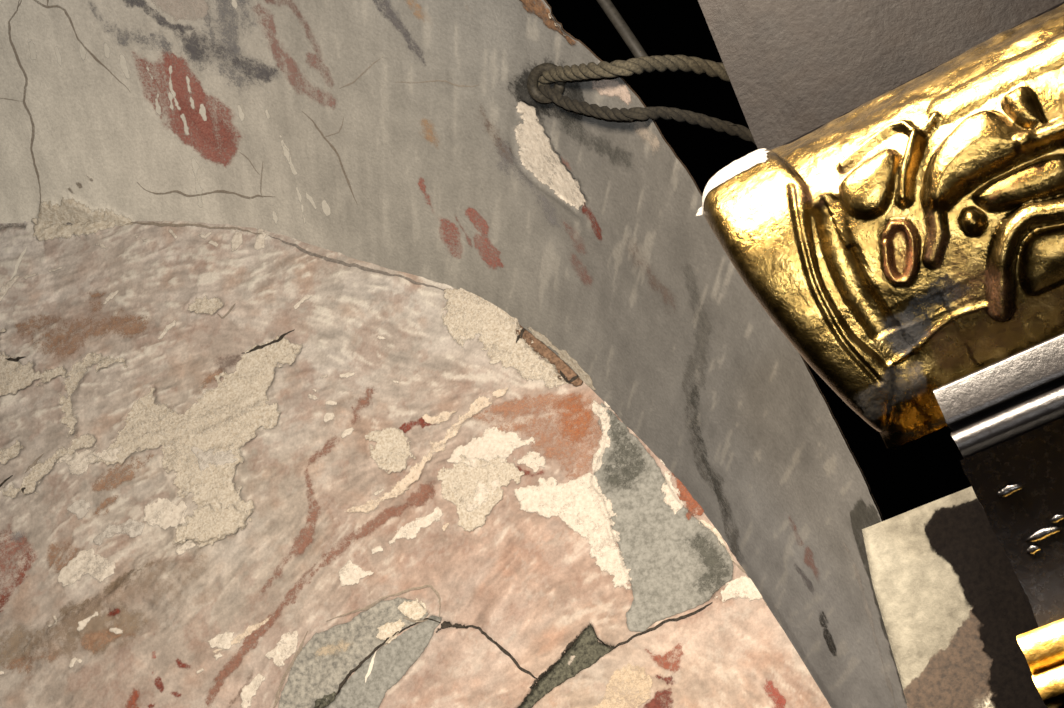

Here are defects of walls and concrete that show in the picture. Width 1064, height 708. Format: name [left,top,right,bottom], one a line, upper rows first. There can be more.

crack [0,0,129,229]
spalling [31,179,133,241]
crack [302,111,357,203]
peeling [514,101,602,239]
spalling [0,329,303,587]
peeling [308,389,337,422]
spalling [339,288,632,589]
peeling [660,459,767,605]
crack [273,585,712,708]